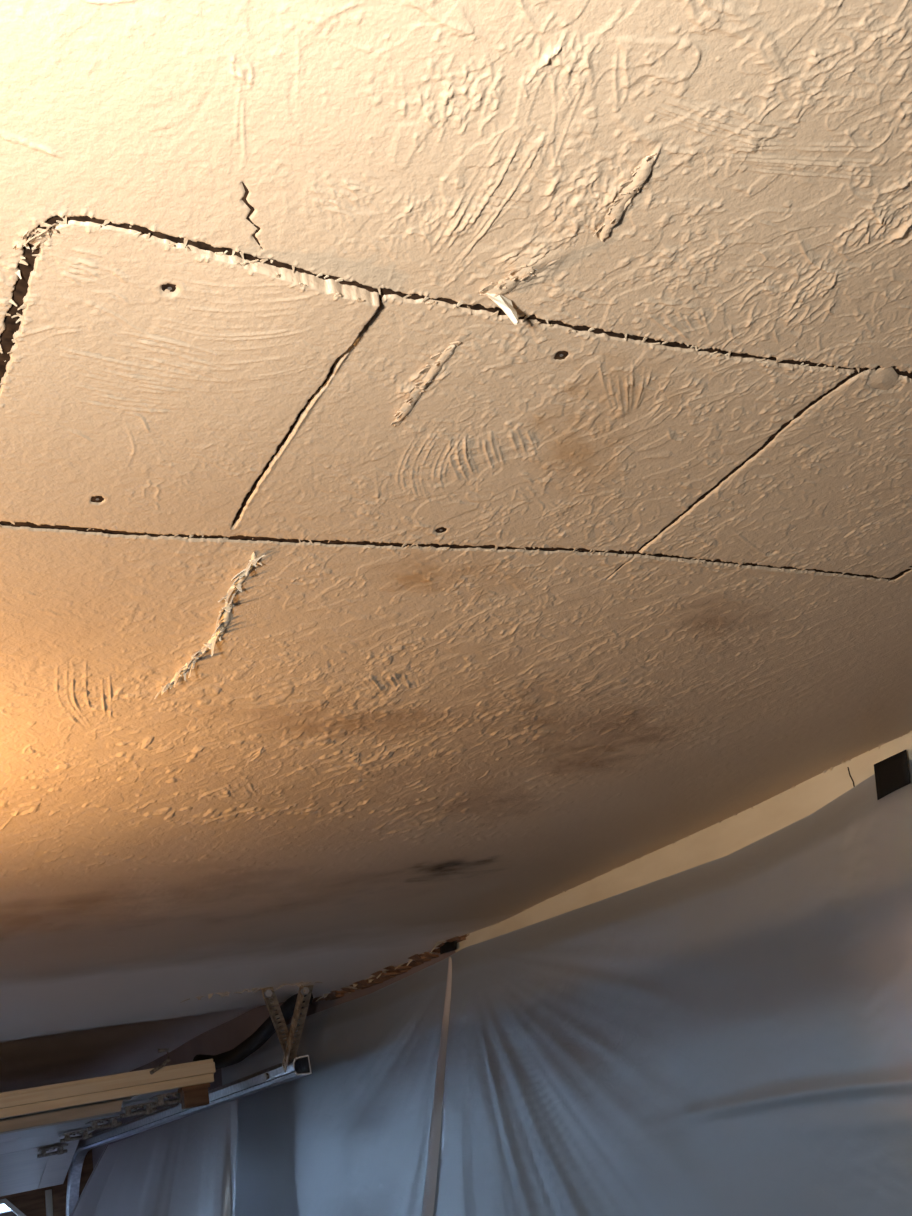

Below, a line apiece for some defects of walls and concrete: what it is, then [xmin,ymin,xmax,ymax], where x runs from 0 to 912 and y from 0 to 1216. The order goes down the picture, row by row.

crack [0,182,912,582]
peeling [312,934,469,1002]